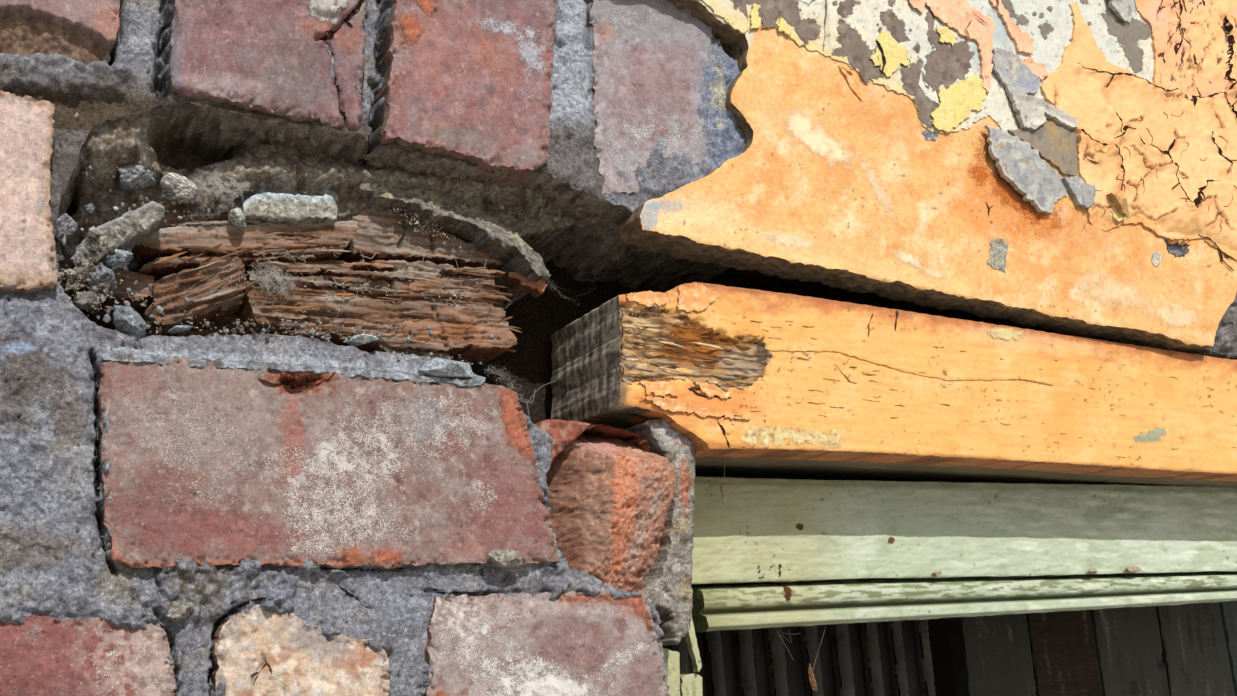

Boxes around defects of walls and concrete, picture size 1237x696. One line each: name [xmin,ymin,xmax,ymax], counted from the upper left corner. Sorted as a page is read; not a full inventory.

crack [315,0,366,121]
peeling [695,0,1237,272]
crack [1078,0,1237,271]
peeling [625,284,717,313]
peeling [638,378,751,420]
crack [750,311,1058,418]
spalling [1212,301,1237,356]